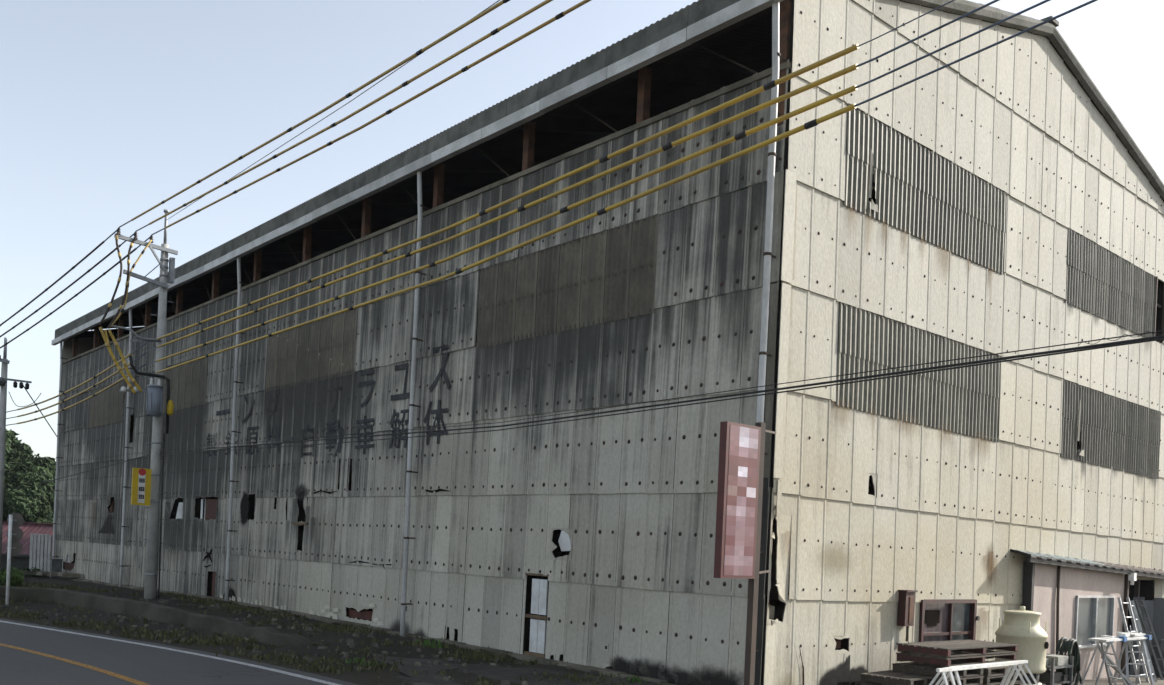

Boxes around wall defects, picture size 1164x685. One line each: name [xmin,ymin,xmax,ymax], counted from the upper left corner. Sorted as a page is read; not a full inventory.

peeling [869,149,878,212]
spalling [766,514,792,624]
peeling [206,570,286,610]
spalling [309,603,384,625]
spalling [833,635,851,654]